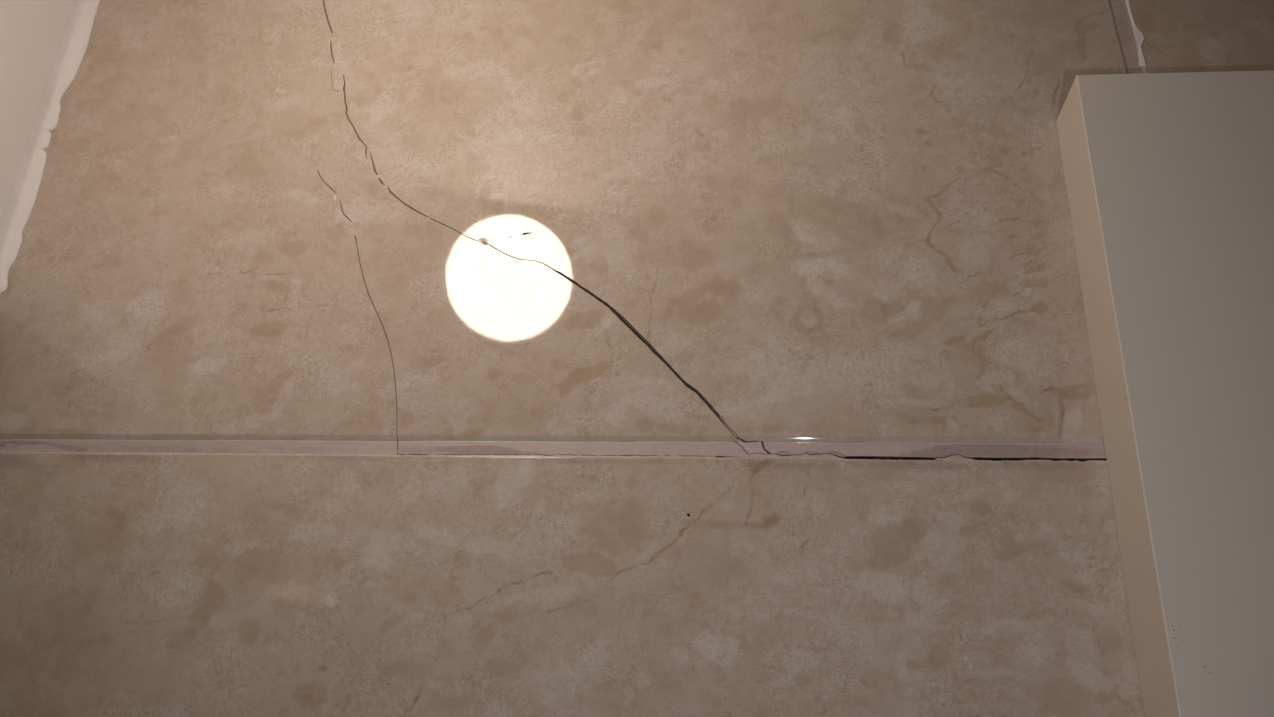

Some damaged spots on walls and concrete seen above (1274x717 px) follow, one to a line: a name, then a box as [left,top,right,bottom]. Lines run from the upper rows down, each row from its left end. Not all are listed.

crack [317,0,1107,464]